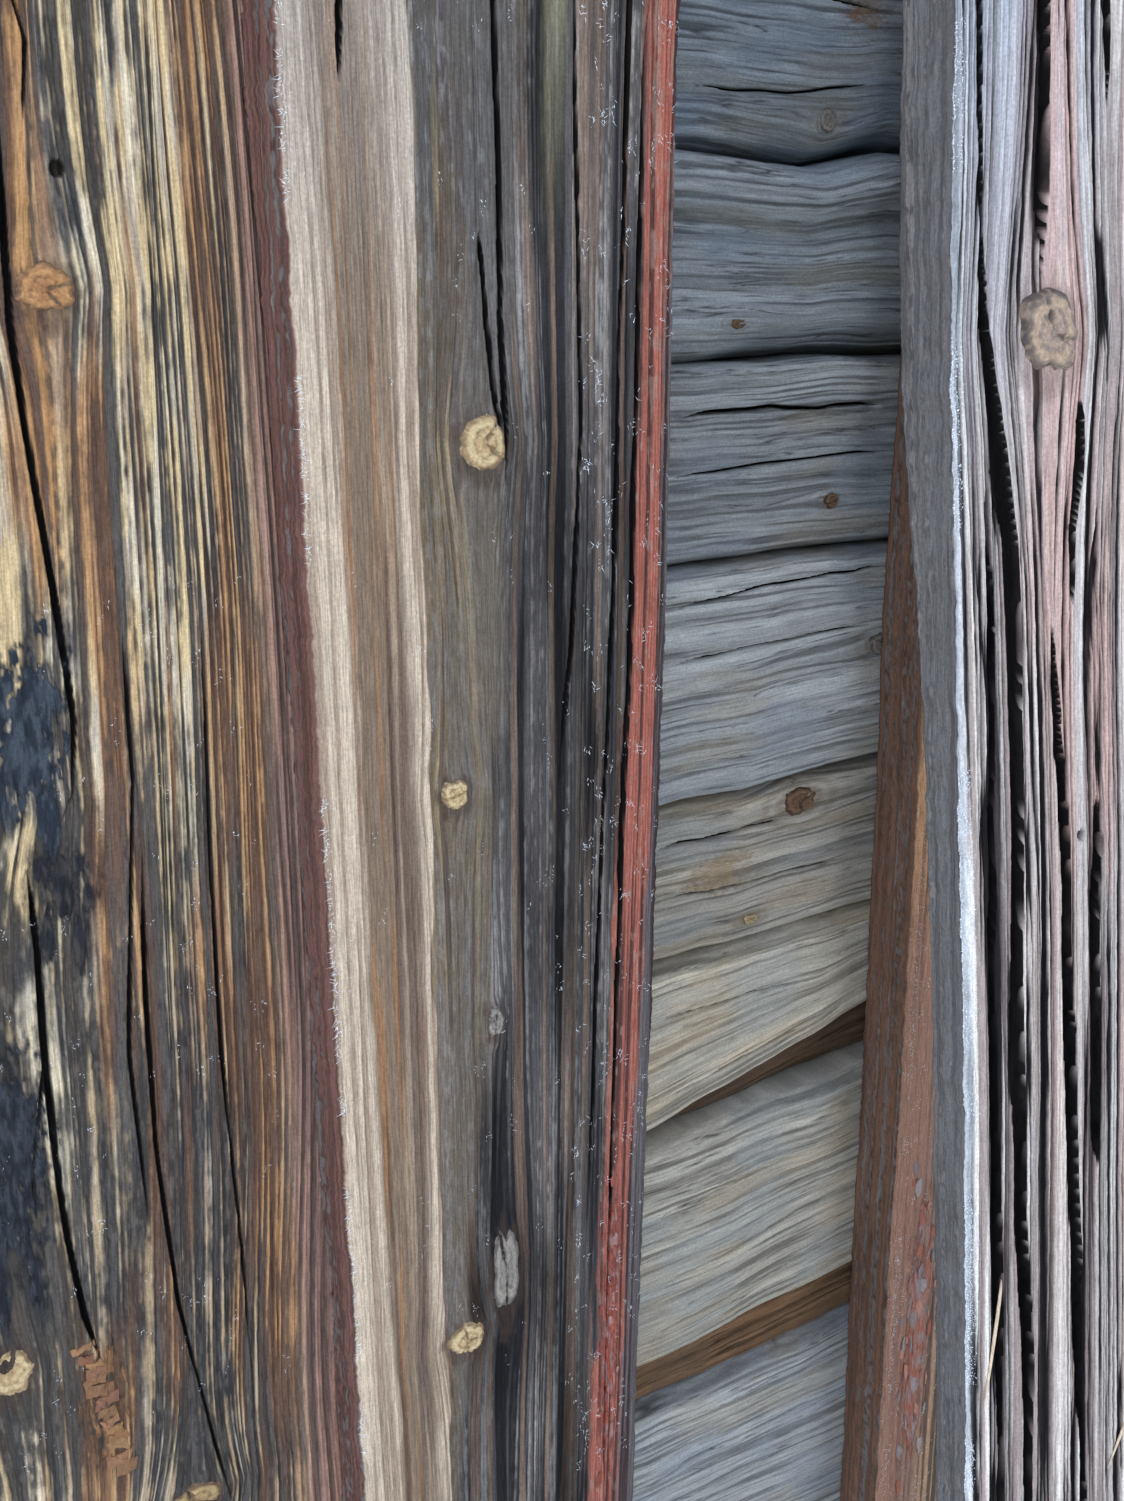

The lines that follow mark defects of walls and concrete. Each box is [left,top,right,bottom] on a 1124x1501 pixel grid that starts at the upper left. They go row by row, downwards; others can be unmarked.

crack [332,5,340,72]
crack [27,867,100,1357]